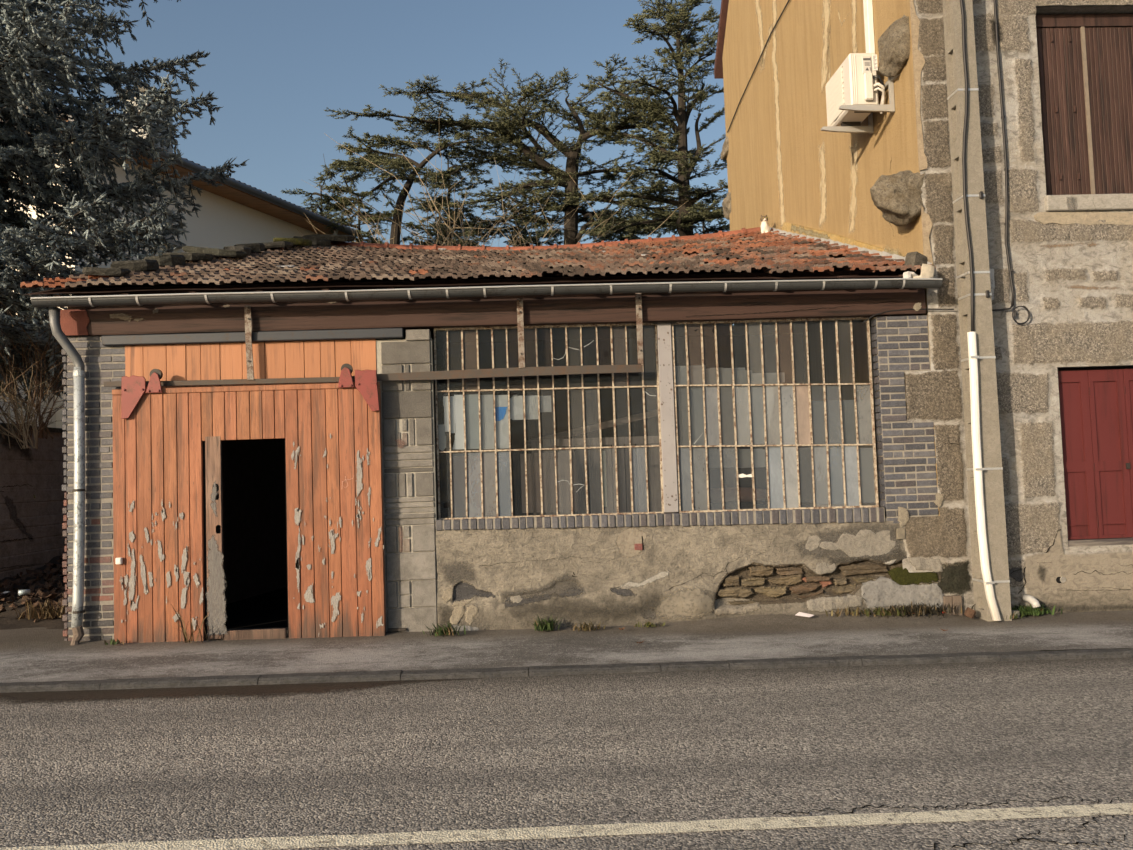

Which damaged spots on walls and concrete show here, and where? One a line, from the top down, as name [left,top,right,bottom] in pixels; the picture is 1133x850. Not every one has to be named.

peeling [119,499,227,635]
peeling [293,448,384,629]
spalling [441,562,583,631]
flaking render [610,571,669,596]
flaking render [713,507,943,616]
crack [773,793,1132,850]